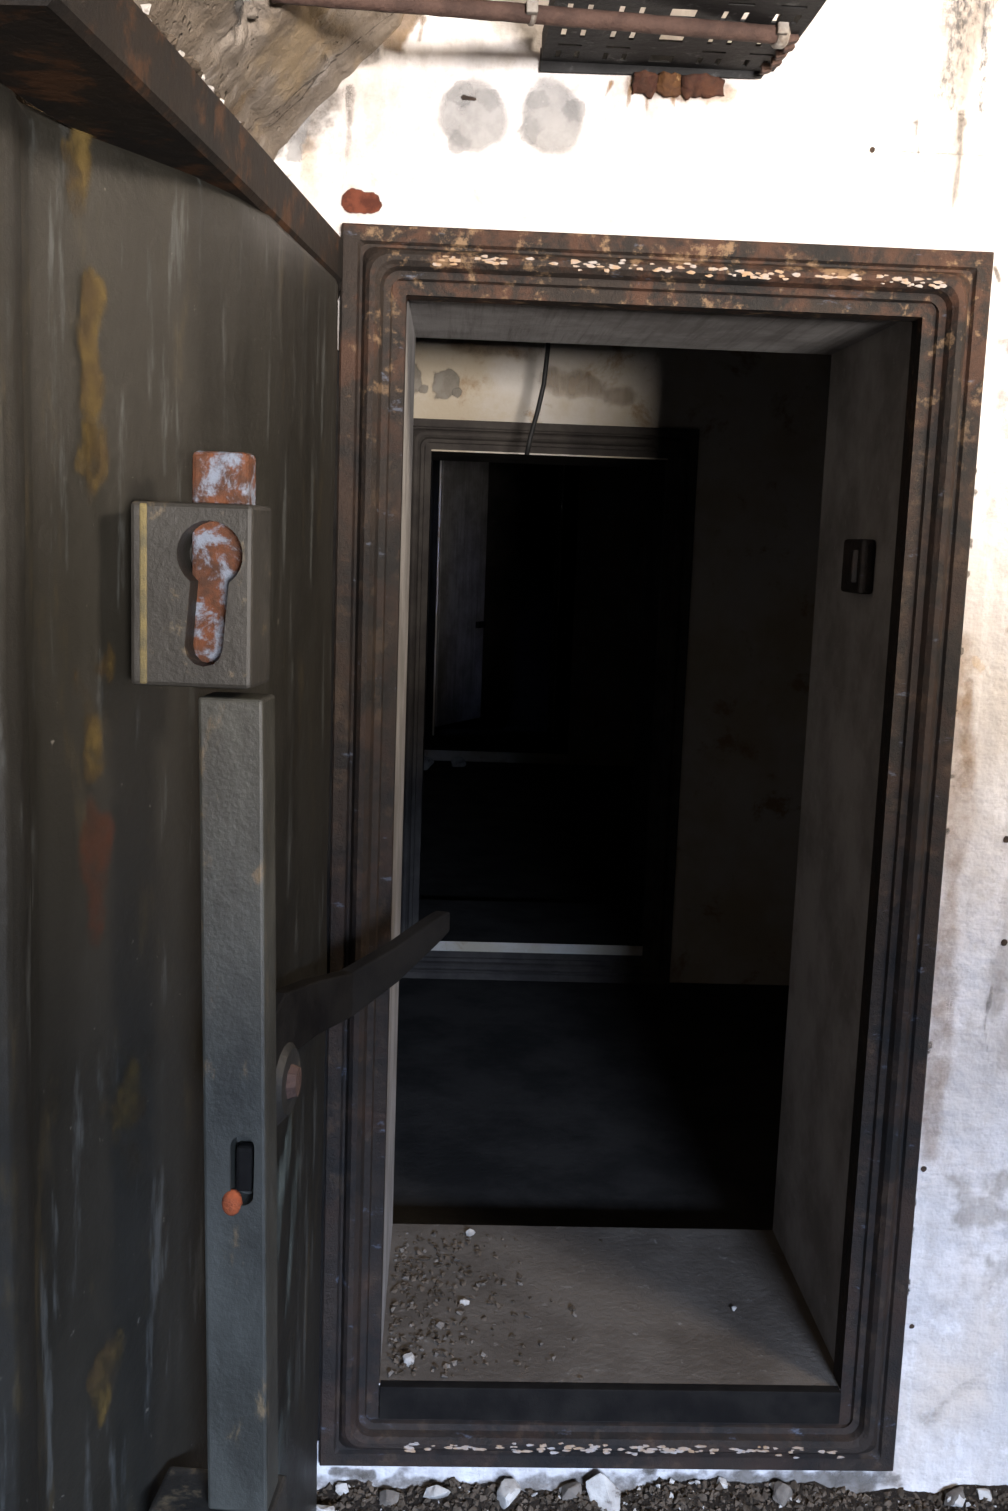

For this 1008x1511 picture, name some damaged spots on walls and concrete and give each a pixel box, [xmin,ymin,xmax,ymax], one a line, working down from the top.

damp [943,0,994,111]
corrosion [341,188,382,214]